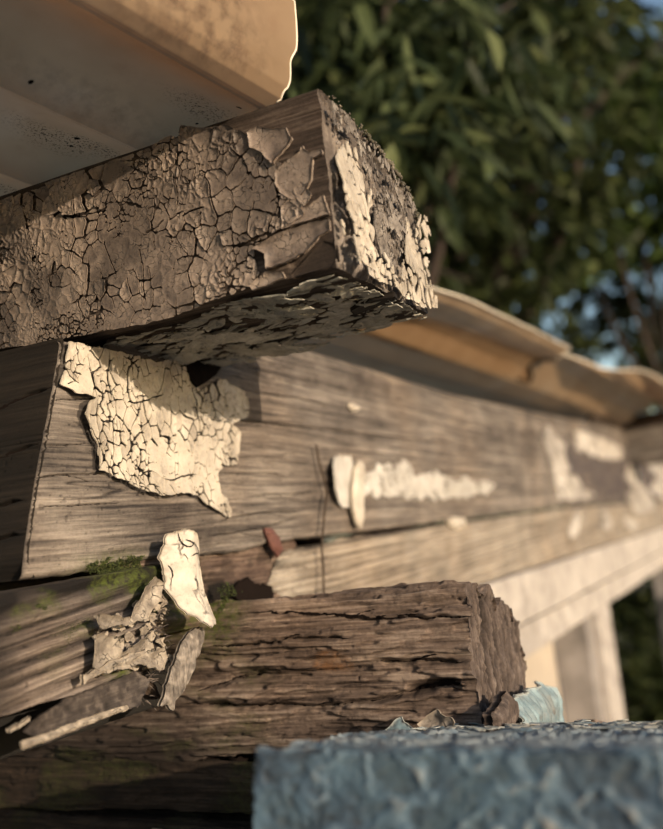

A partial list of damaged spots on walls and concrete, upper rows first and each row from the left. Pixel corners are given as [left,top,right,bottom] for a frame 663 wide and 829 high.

crack [0,124,329,349]
peeling [59,95,438,518]
peeling [364,459,494,502]
peeling [445,517,466,529]
peeling [92,591,173,672]
crack [215,609,471,647]
crack [186,654,462,707]